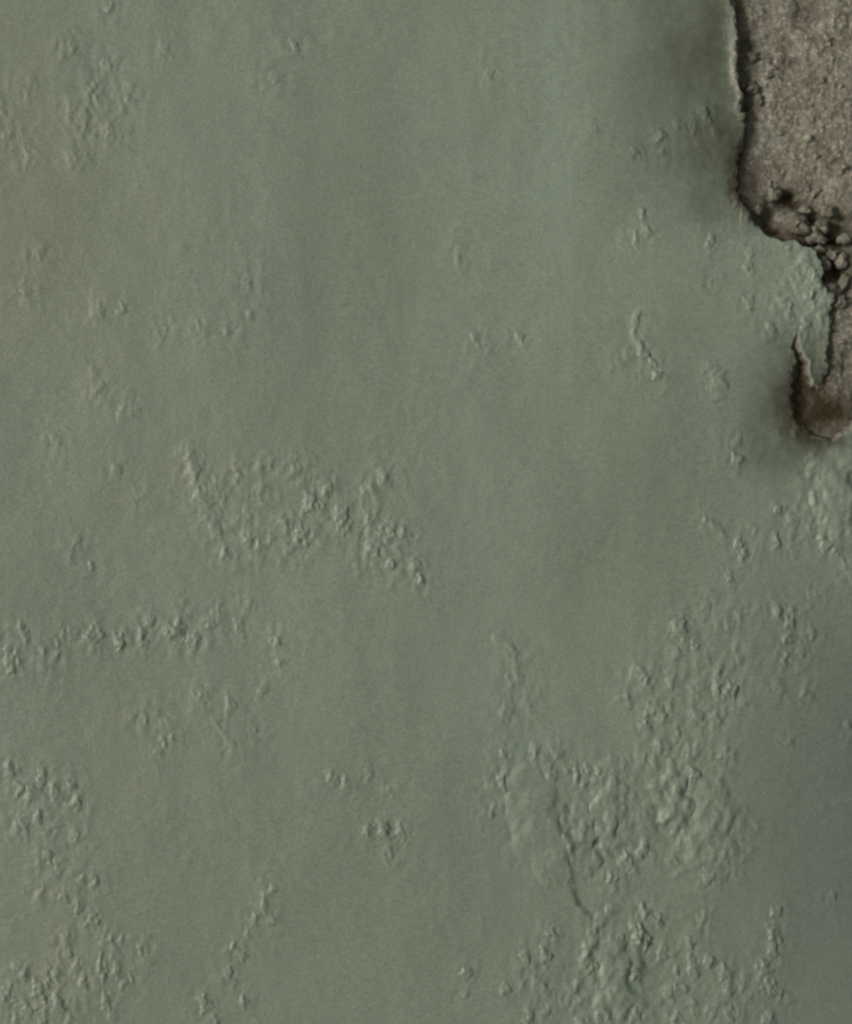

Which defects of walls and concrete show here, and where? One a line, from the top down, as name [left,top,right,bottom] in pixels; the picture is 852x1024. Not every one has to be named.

flaking render [717,0,852,450]